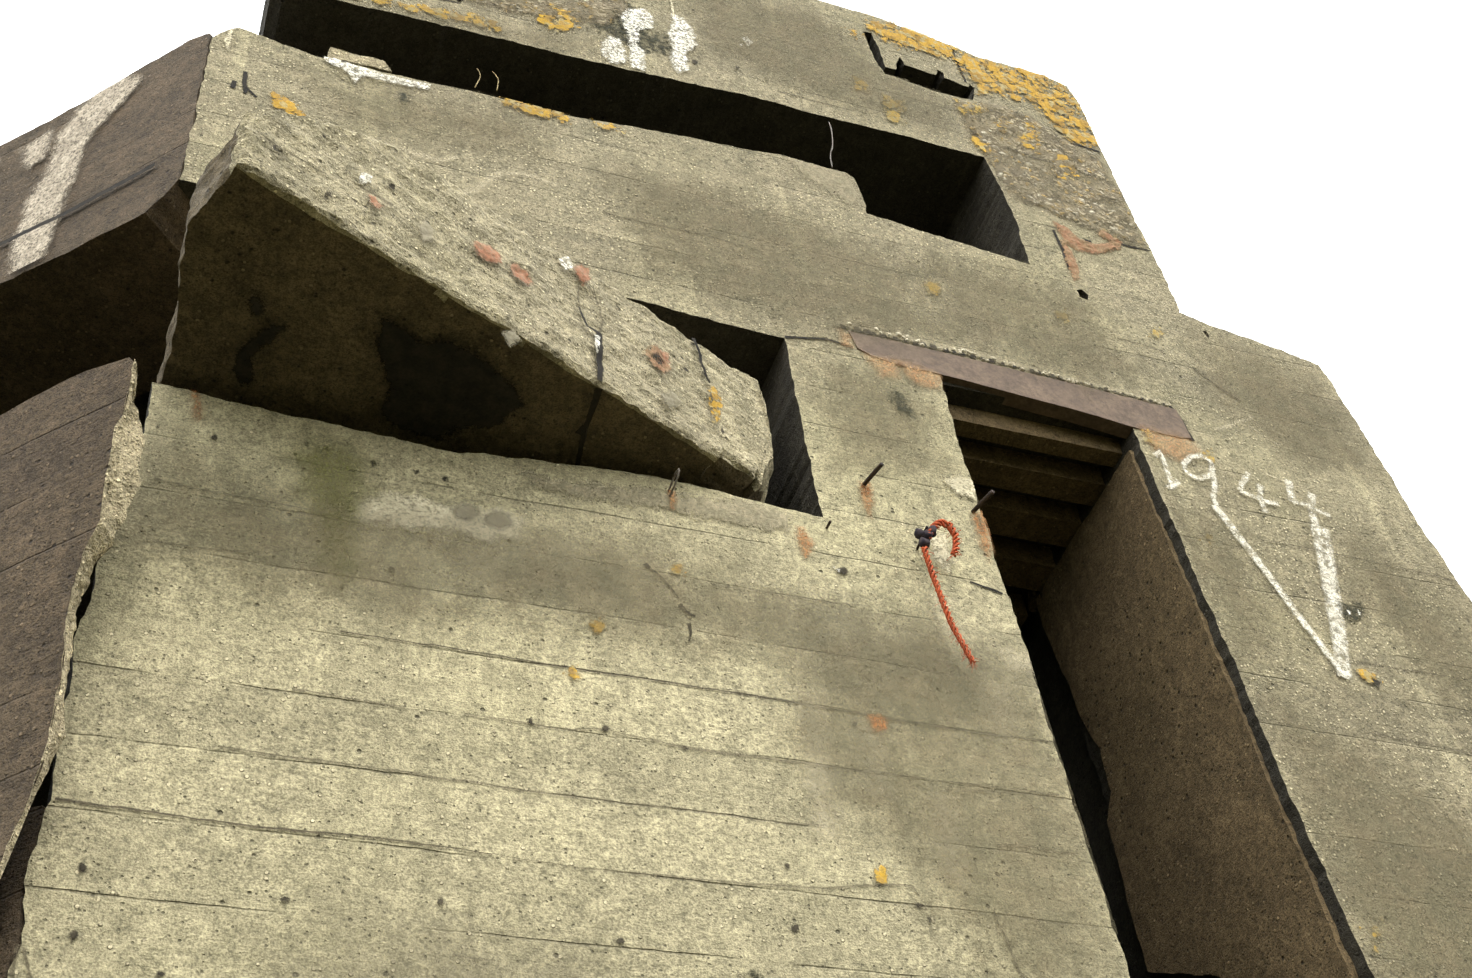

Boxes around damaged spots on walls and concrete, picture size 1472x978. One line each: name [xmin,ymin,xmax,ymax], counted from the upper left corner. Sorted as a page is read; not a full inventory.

crack [0,359,920,897]
rust [974,512,993,555]